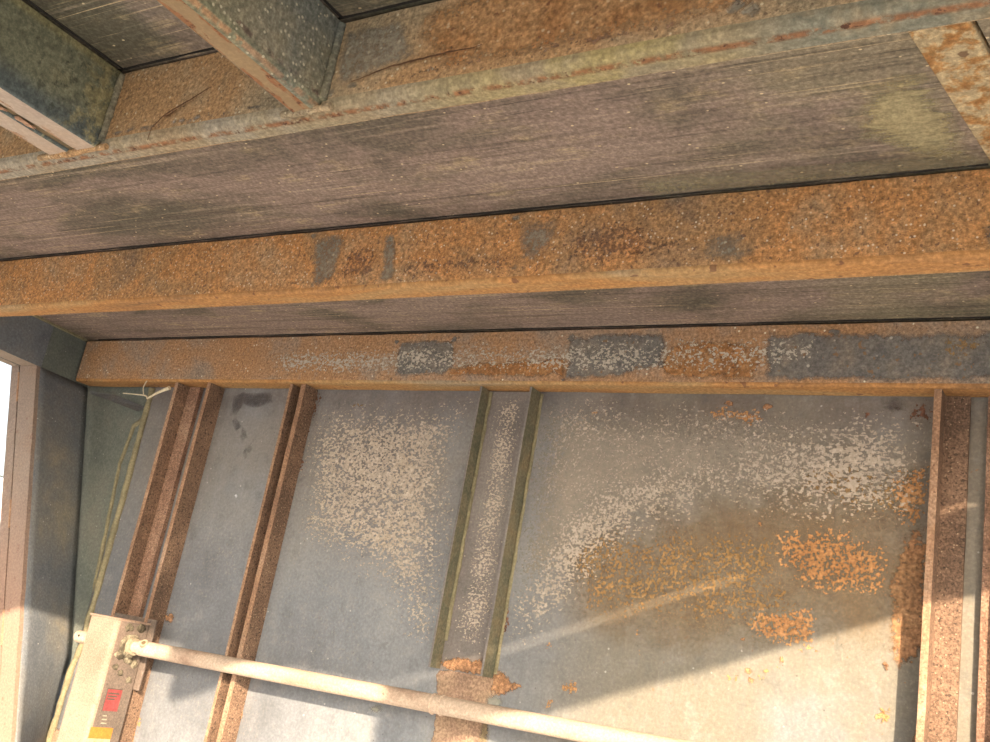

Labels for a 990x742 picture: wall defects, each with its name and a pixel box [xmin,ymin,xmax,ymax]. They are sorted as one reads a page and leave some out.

rust [422,0,745,66]
rust [449,358,564,377]
rust [663,342,759,379]
water stain [233,395,268,409]
water stain [299,397,474,644]
water stain [509,398,930,645]
rust [567,466,930,670]